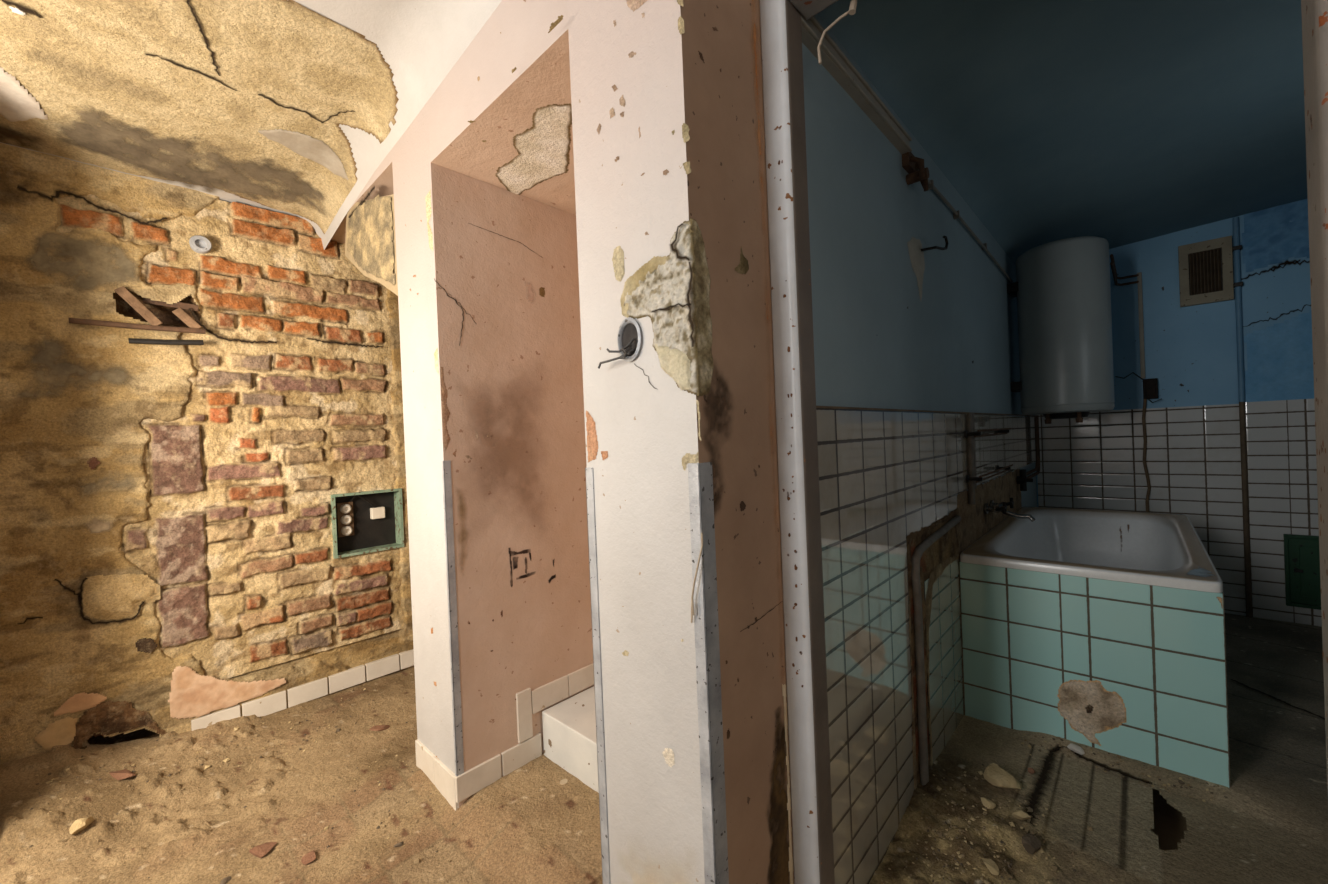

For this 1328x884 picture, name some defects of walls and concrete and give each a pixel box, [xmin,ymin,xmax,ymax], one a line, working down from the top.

crack [146,0,355,123]
crack [17,186,167,225]
water stain [61,112,323,210]
peeling [492,103,572,195]
flaking render [0,0,405,680]
flaking render [612,218,714,471]
crack [1241,260,1310,280]
crack [1243,304,1311,327]
spalling [1057,680,1127,746]
water stain [768,712,790,884]